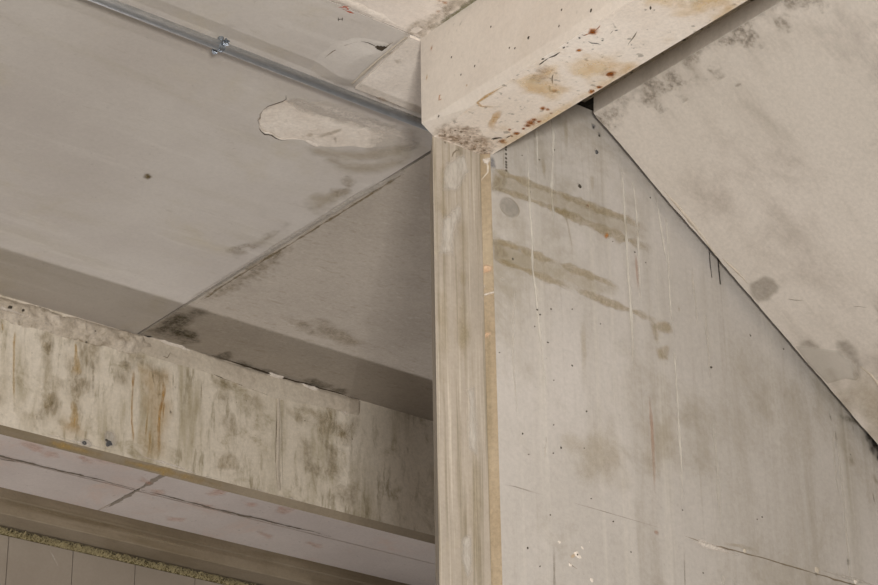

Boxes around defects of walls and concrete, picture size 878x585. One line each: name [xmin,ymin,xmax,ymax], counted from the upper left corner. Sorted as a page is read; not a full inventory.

spalling [258,99,416,149]
crack [0,455,331,537]
crack [686,536,872,585]